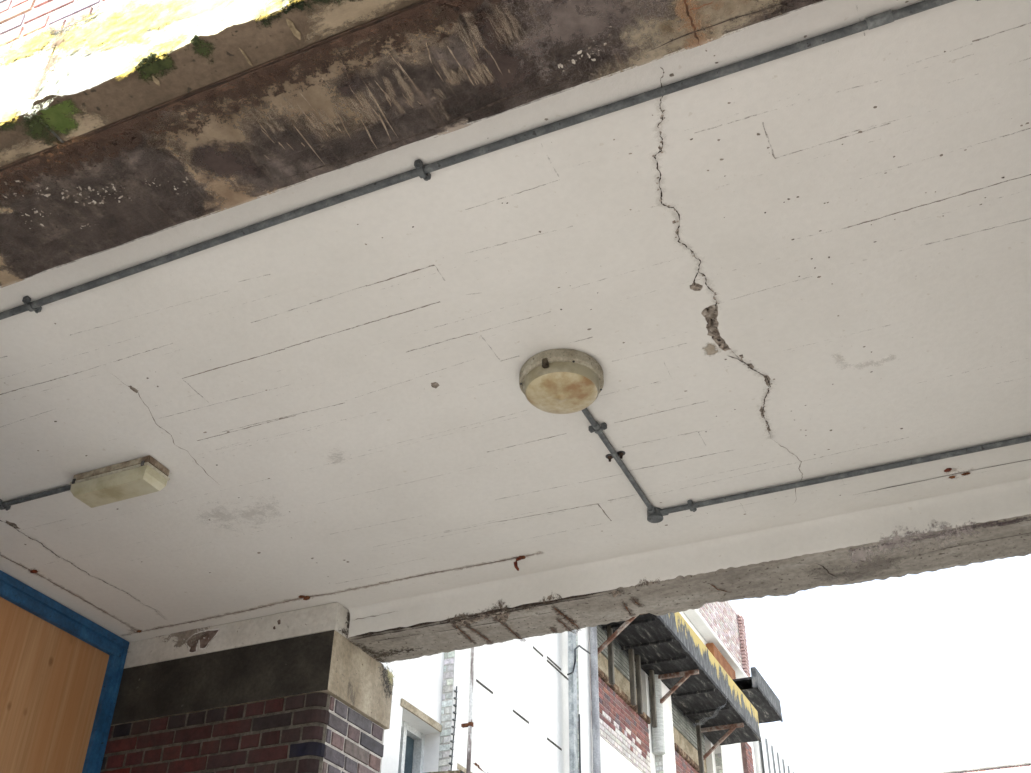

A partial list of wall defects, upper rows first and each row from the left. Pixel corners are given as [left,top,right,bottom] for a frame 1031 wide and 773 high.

corrosion [0,0,530,208]
damp [0,0,816,288]
crack [647,0,792,308]
spalling [701,305,730,355]
crack [115,376,221,486]
crack [729,350,803,502]
damp [849,517,1031,563]
peeling [186,628,219,653]